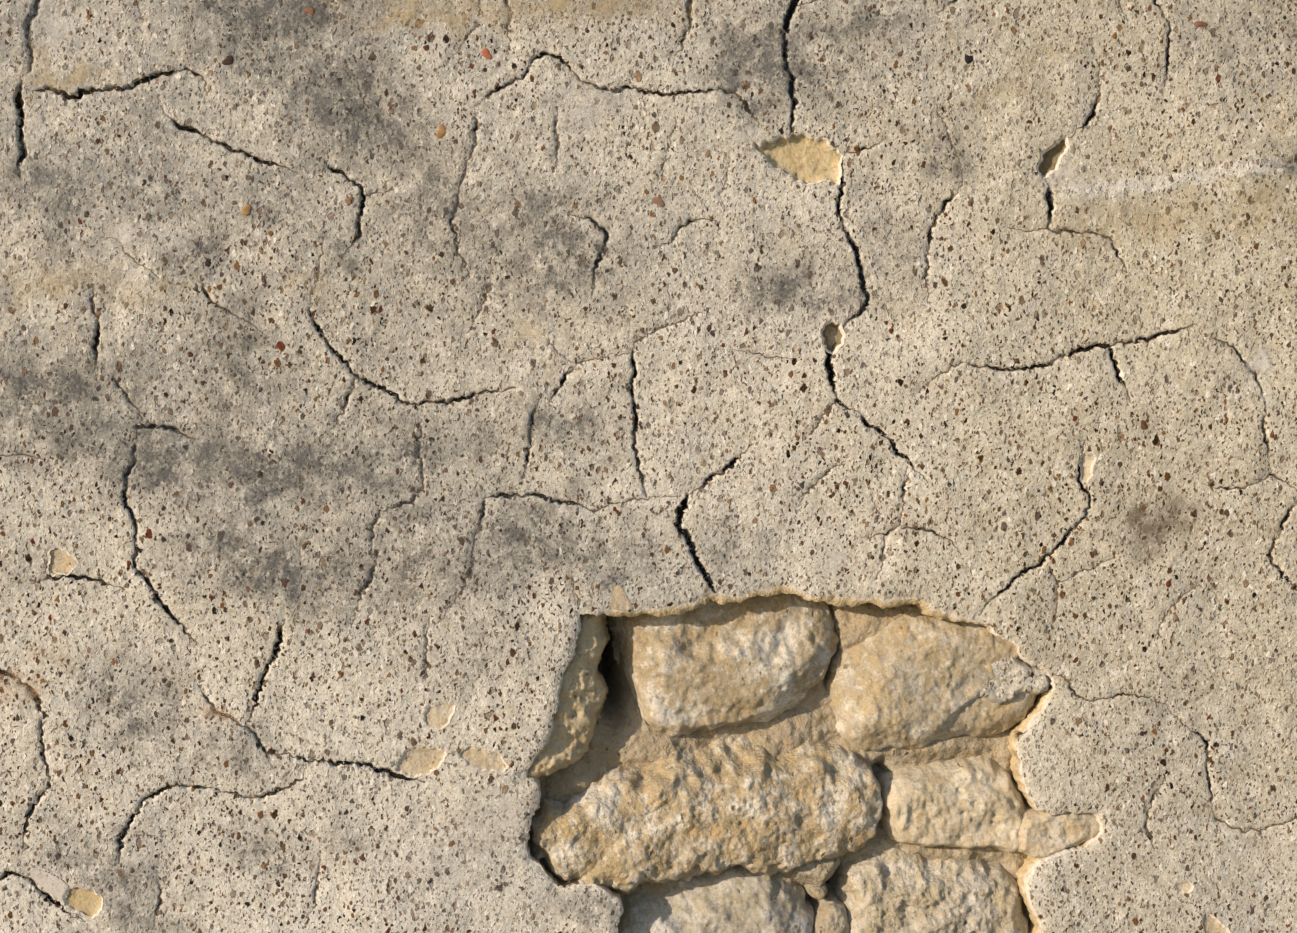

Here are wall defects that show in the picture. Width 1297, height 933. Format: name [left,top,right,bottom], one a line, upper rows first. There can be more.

crack [15,0,295,179]
spalling [753,132,843,186]
spalling [1037,136,1070,178]
spalling [46,545,79,577]
crack [31,283,197,644]
crack [308,157,752,678]
crack [809,137,961,579]
crack [920,323,1297,591]
crack [117,618,424,864]
spalling [395,746,509,779]
flaking render [525,585,1103,933]
spalling [30,869,103,920]